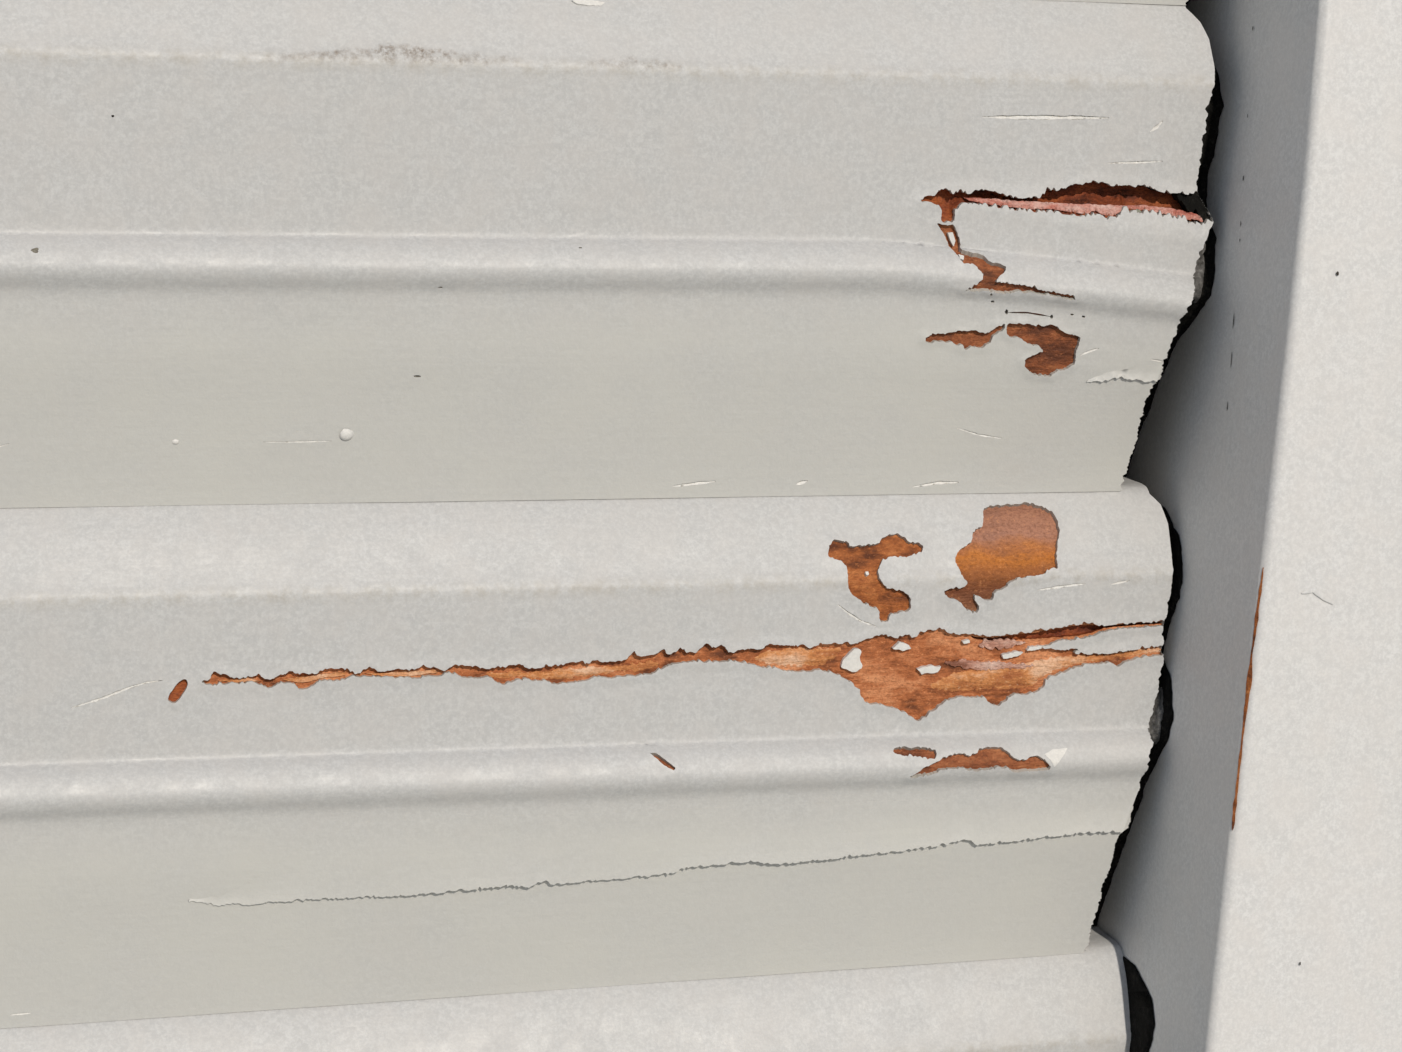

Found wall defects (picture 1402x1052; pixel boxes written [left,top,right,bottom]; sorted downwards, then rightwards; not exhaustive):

peeling [926,323,1079,375]
peeling [828,535,922,621]
peeling [944,505,1058,611]
peeling [168,679,188,702]
peeling [893,748,1067,775]